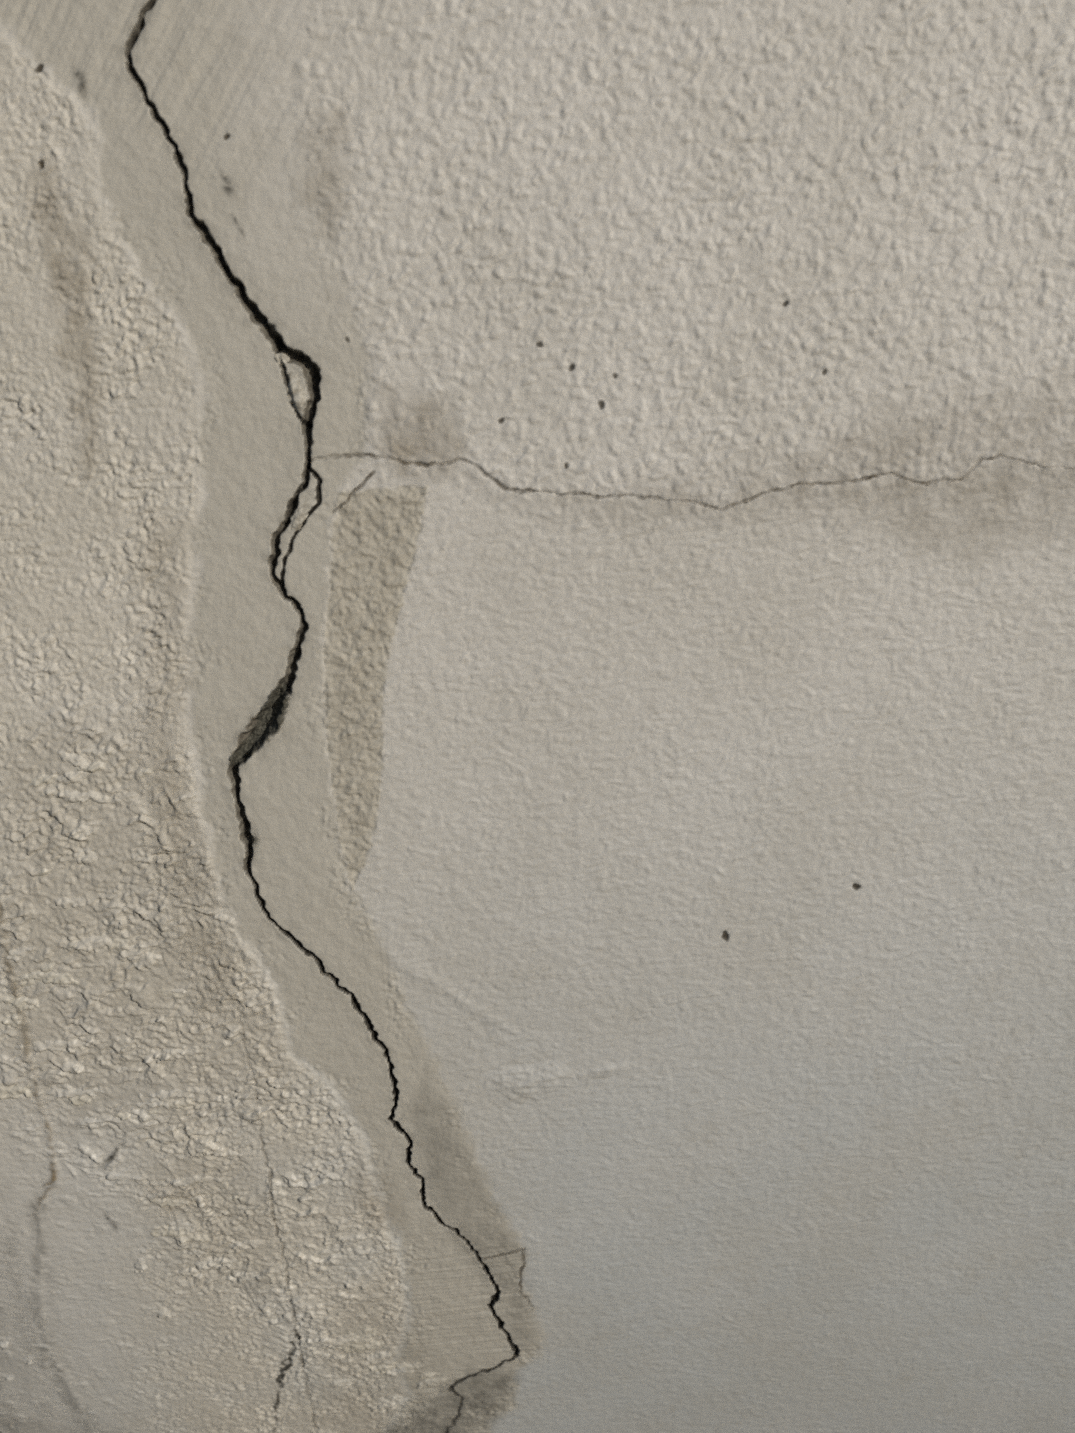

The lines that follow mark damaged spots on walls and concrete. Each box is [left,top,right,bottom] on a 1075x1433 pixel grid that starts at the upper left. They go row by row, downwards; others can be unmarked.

crack [125,0,525,1433]